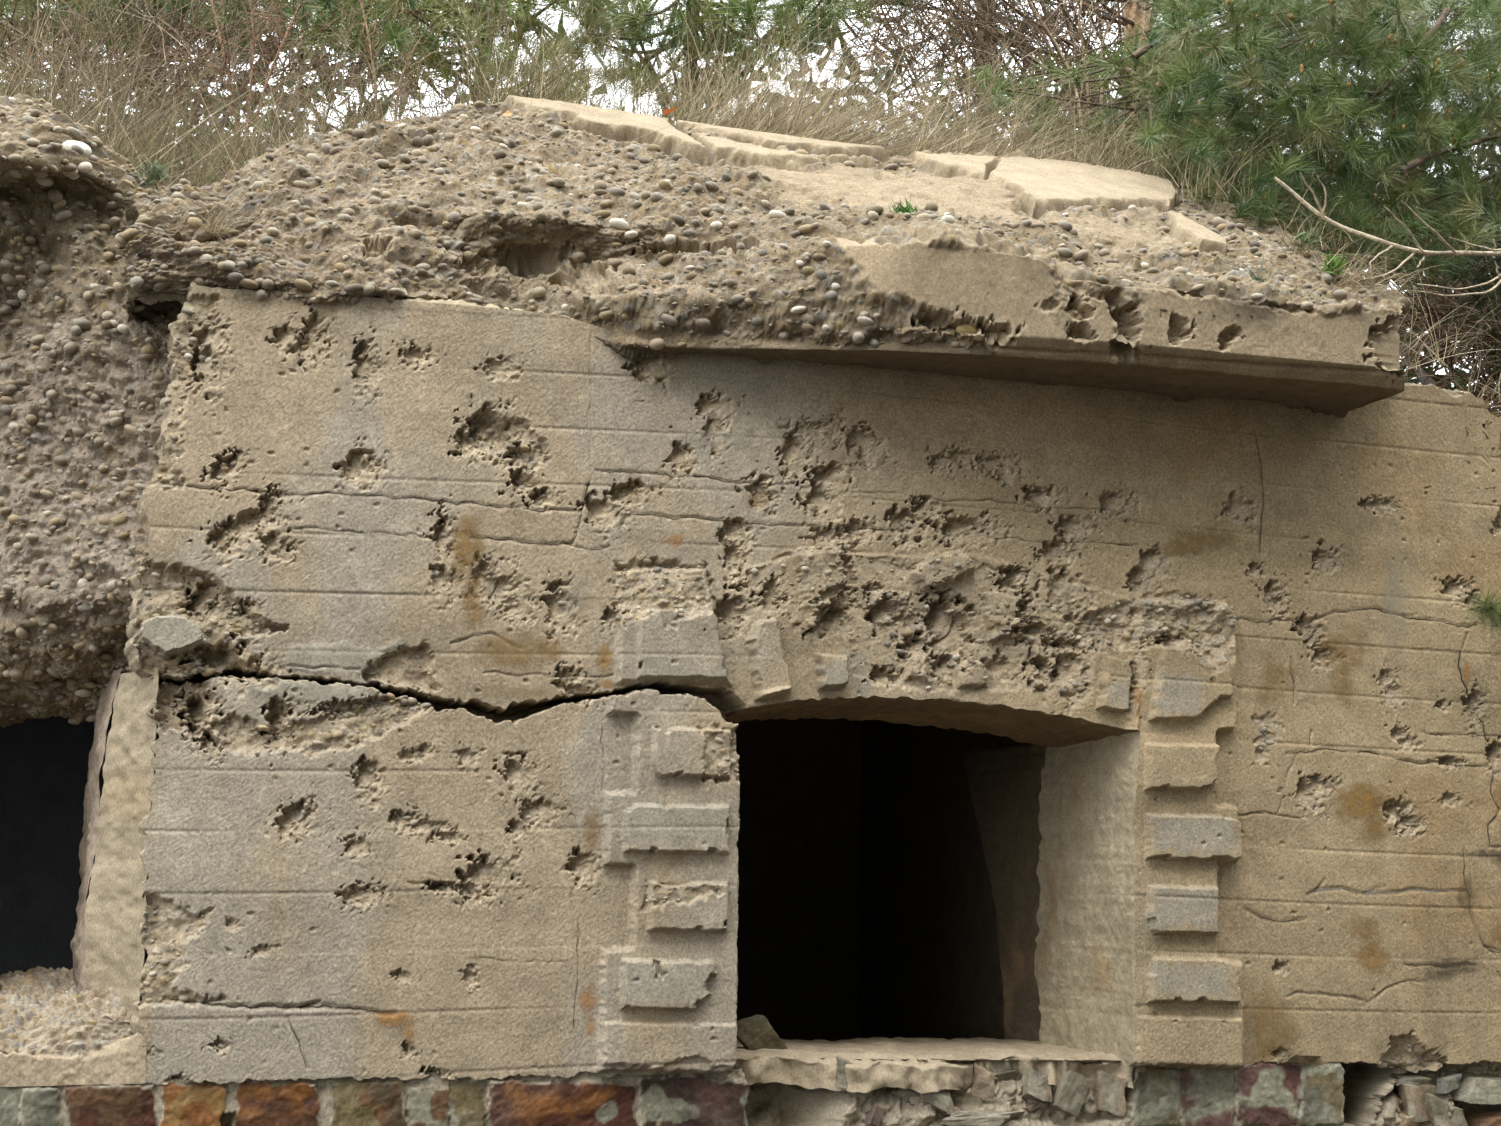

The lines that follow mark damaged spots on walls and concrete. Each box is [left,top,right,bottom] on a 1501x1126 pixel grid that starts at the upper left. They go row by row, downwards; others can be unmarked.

peeling [691,131,876,172]
spalling [621,356,678,398]
spalling [908,288,1247,372]
spalling [1355,311,1405,393]
spalling [448,354,658,542]
spalling [662,392,738,490]
spalling [133,292,570,915]
spalling [426,411,1238,717]
crack [158,633,748,780]
crack [1227,607,1501,1003]
spalling [562,845,612,892]
spalling [1379,1029,1449,1073]